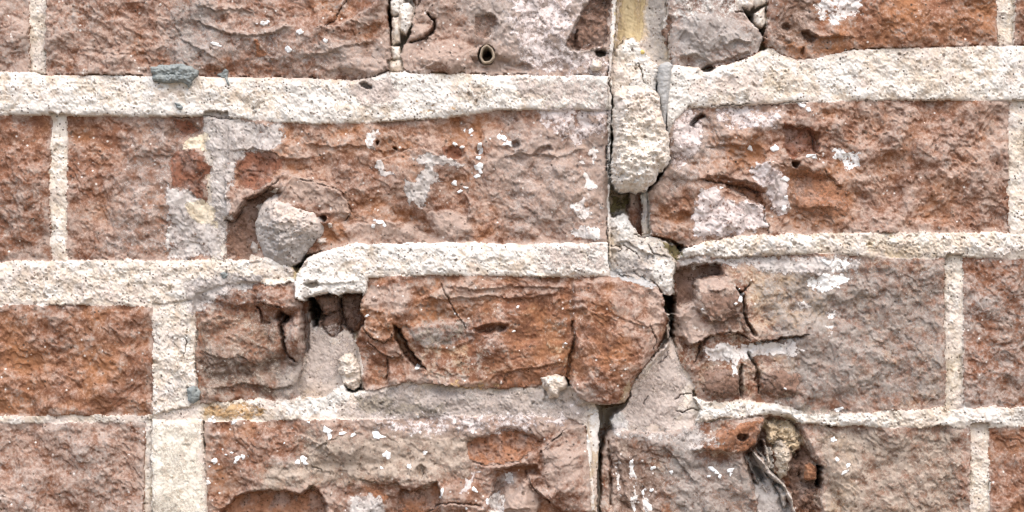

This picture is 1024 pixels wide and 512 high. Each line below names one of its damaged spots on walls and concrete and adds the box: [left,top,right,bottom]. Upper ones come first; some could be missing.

spalling [223,151,285,260]
spalling [312,294,363,334]
crack [651,275,804,392]
spalling [771,420,820,511]